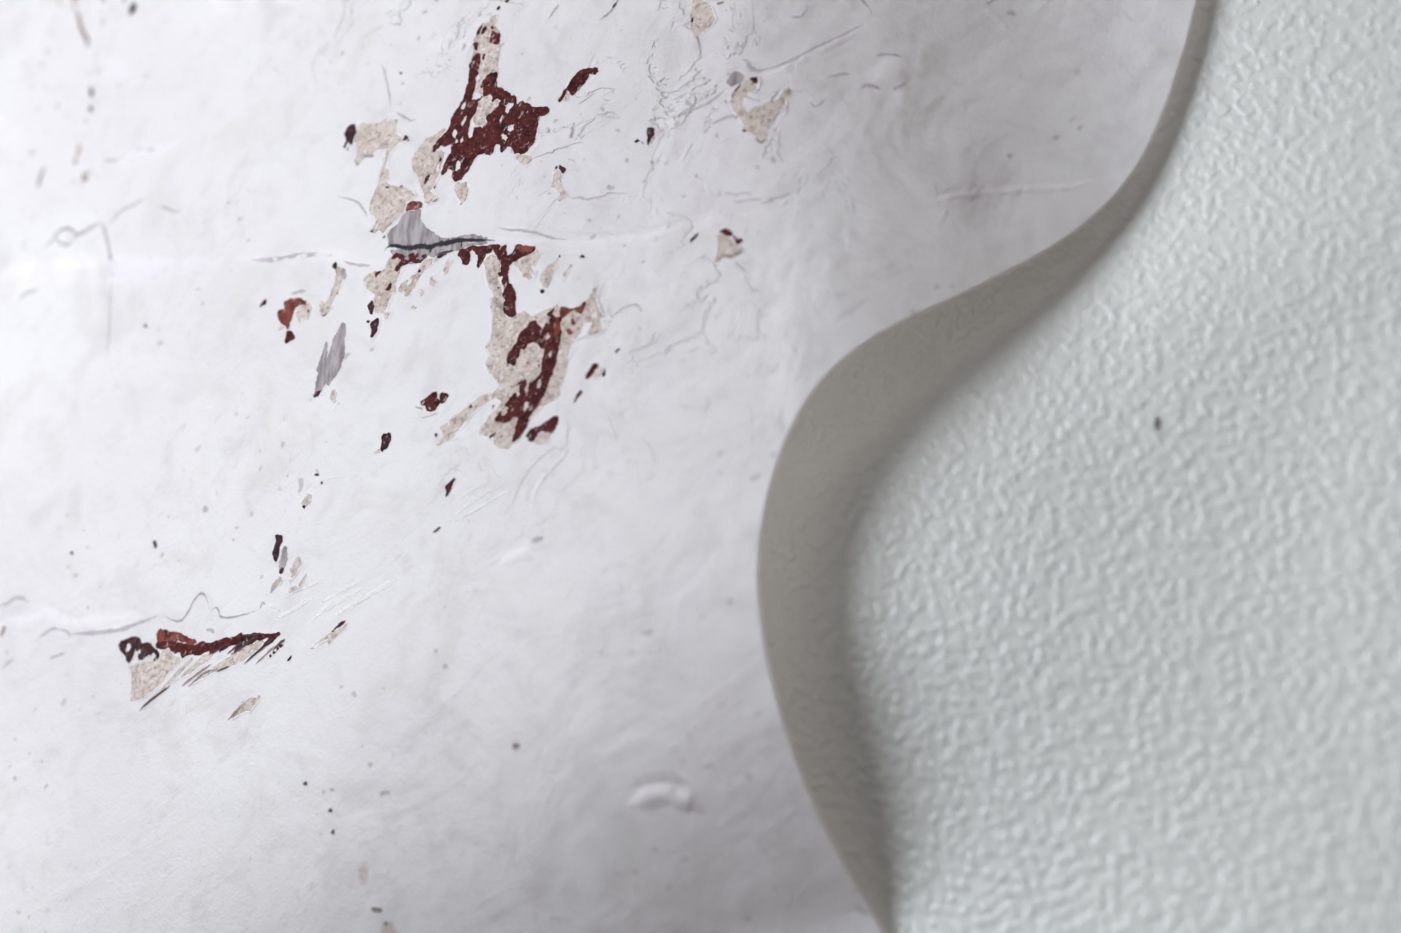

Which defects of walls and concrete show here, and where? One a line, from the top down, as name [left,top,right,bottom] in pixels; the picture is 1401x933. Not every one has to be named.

spalling [343,0,598,237]
spalling [726,71,795,144]
crack [382,236,491,255]
spalling [260,244,609,454]
spalling [119,629,292,711]
peeling [311,620,349,649]